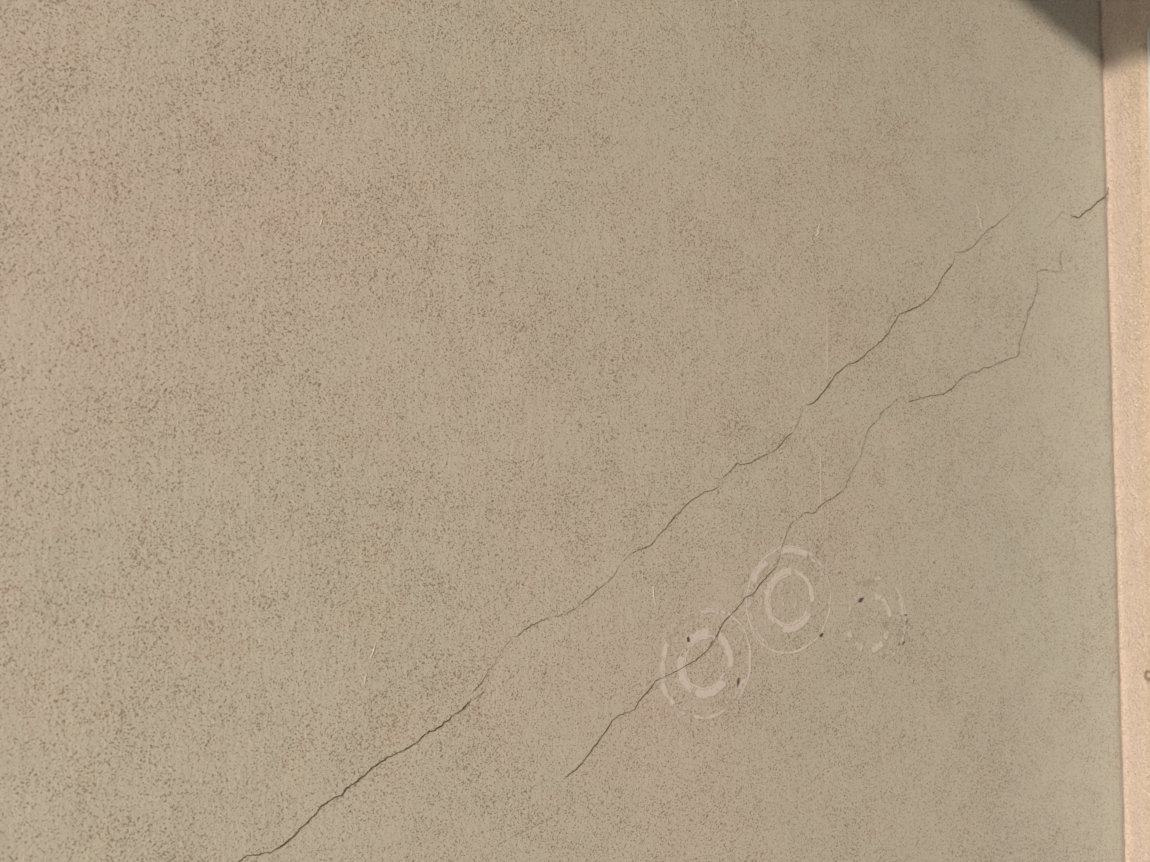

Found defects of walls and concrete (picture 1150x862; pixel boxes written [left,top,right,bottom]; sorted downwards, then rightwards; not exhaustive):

crack [238,196,1026,862]
crack [565,187,1109,778]